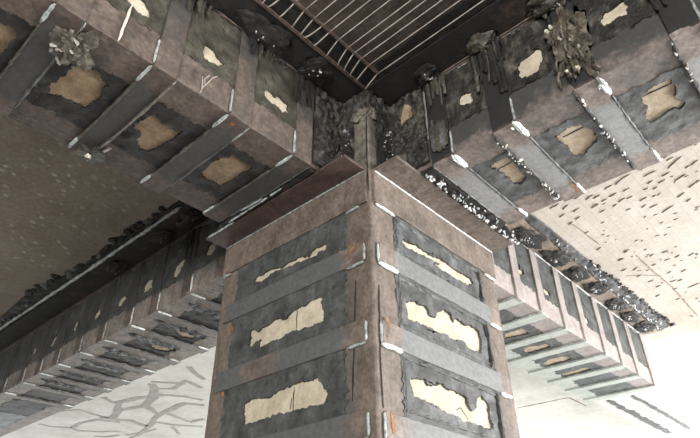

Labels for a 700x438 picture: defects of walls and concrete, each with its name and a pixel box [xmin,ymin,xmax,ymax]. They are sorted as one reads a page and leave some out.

peeling [47,65,108,106]
peeling [642,79,684,121]
peeling [557,117,629,162]
peeling [402,241,472,285]
peeling [250,298,324,347]
crack [351,280,359,322]
crack [377,285,385,408]
peeling [406,301,480,352]
crack [349,348,357,401]
crack [38,366,206,438]
peeling [244,378,328,424]
peeling [410,379,491,429]